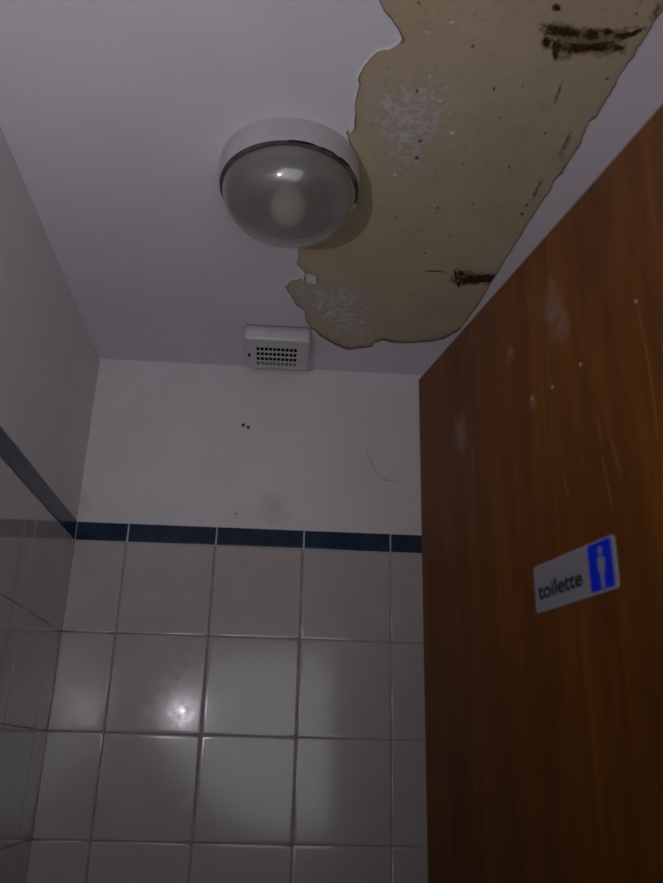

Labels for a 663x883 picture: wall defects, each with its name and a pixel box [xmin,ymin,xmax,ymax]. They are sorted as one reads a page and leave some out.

peeling [284,0,663,350]